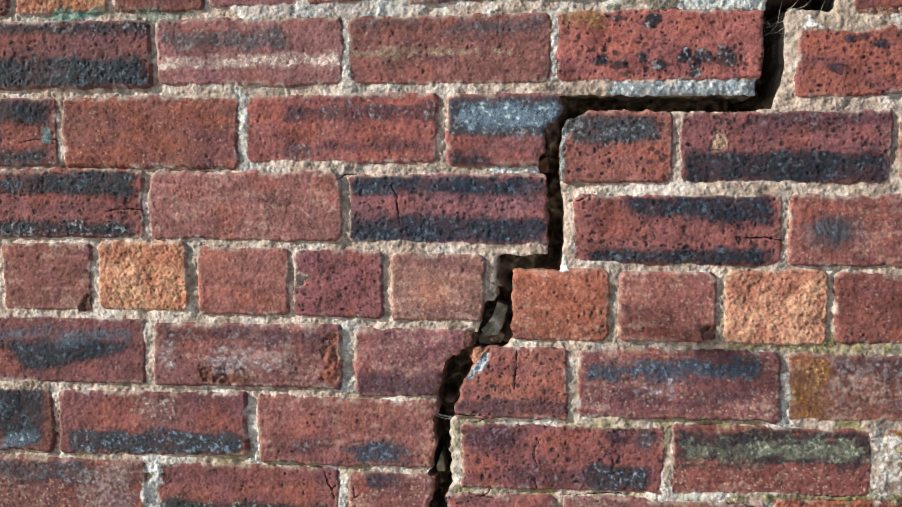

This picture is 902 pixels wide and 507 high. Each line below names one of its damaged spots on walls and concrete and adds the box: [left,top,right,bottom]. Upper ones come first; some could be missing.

crack [427,0,835,507]